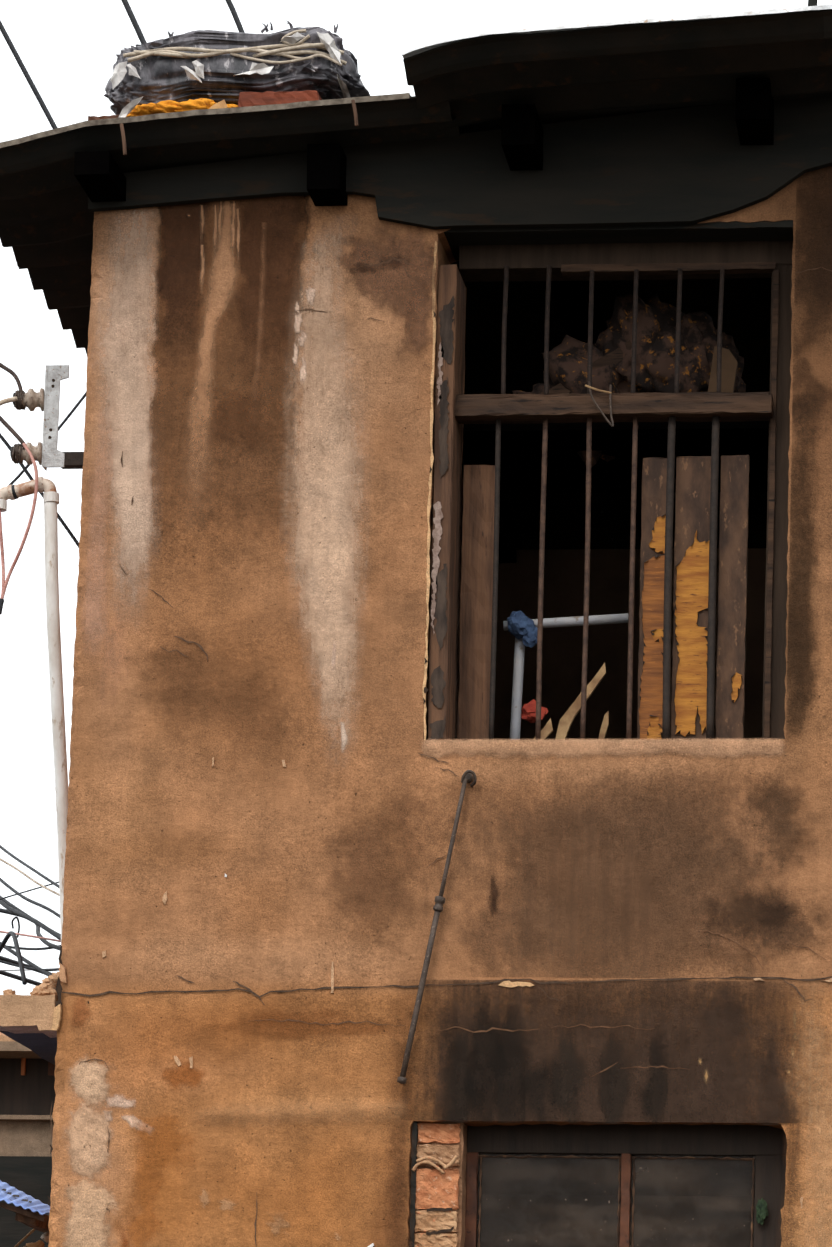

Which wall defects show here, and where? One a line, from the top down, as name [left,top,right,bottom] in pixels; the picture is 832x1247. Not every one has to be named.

water stain [86,195,435,749]
crack [119,564,208,660]
water stain [477,789,819,978]
spalling [64,1059,115,1247]
crack [51,946,832,1033]
crack [591,1062,690,1077]